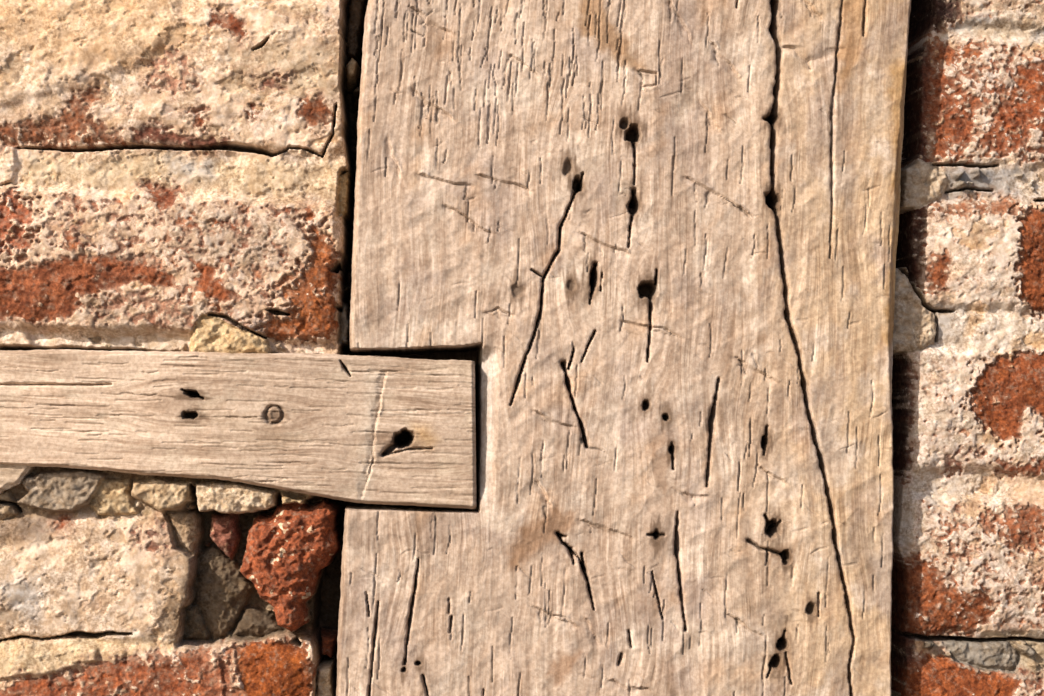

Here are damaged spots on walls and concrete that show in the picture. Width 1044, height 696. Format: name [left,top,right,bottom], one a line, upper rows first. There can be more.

crack [81,145,159,153]
crack [203,108,337,158]
crack [935,163,1000,194]
crack [898,268,955,343]
spalling [0,498,343,696]
crack [0,631,133,644]